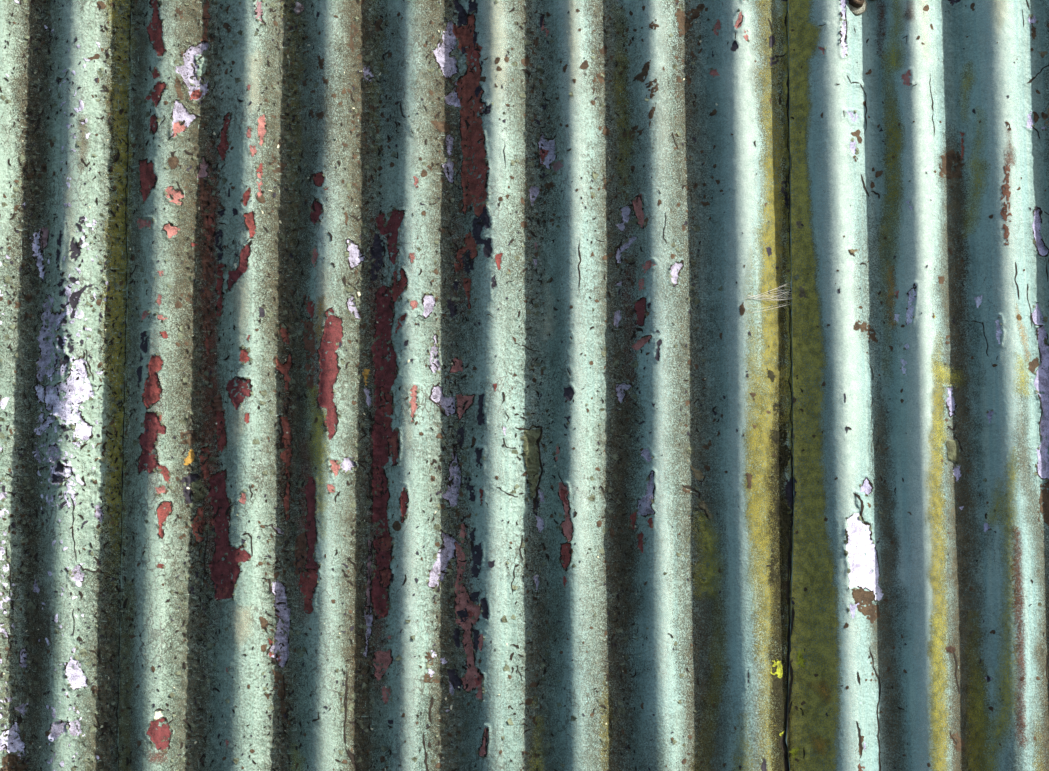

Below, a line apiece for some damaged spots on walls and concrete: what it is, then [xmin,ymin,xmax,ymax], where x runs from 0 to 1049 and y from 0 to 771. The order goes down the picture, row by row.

peeling [95,0,277,154]
peeling [163,44,326,335]
corrosion [452,14,489,217]
corrosion [138,356,172,538]
corrosion [184,113,266,605]
corrosion [298,460,340,613]
corrosion [300,295,343,440]
corrosion [362,210,418,704]
peeling [512,411,559,466]
peeling [843,513,884,601]
peeling [859,477,883,514]
peeling [1032,303,1049,481]